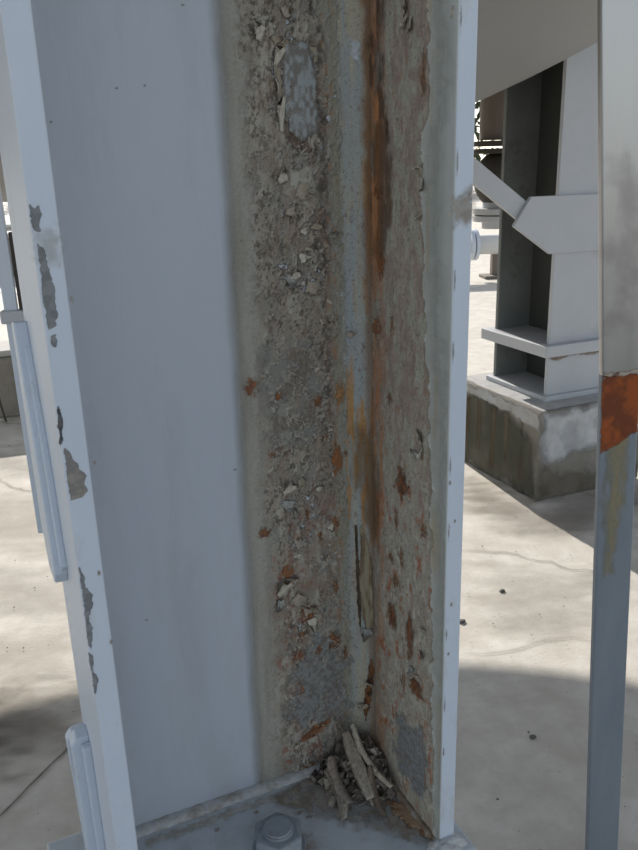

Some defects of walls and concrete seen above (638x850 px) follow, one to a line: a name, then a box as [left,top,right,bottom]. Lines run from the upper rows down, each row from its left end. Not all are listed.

peeling [29,204,42,232]
peeling [37,244,58,347]
peeling [57,406,88,500]
peeling [230,0,357,775]
corrosion [292,0,434,840]
peeling [393,0,462,839]
corrosion [600,374,638,572]
peeling [79,567,98,694]